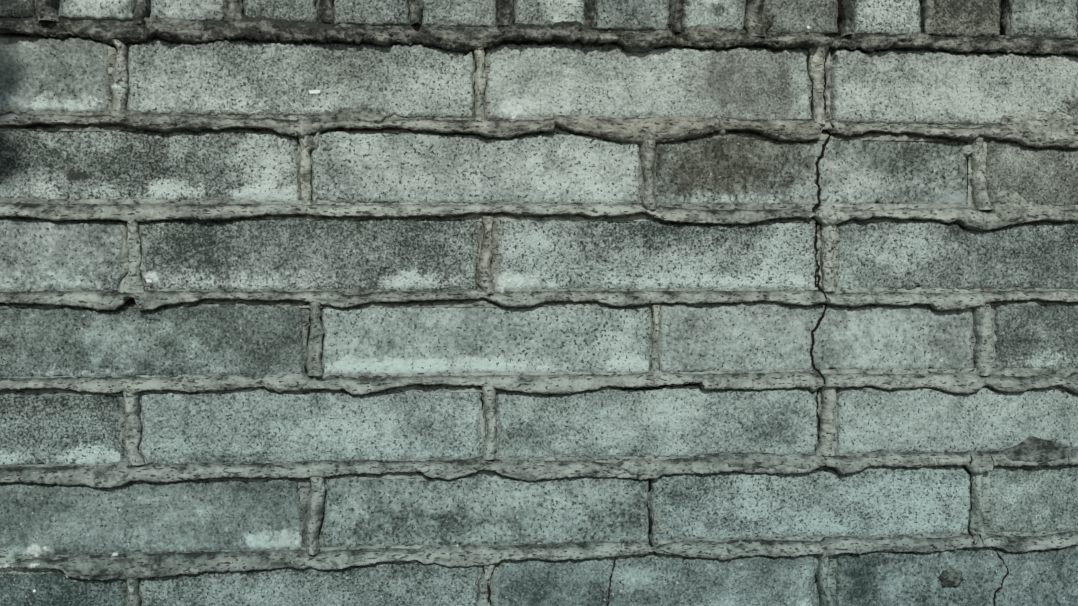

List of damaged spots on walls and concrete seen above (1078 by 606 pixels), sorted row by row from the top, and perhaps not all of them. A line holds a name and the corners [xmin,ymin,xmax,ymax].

crack [806,0,842,466]
crack [606,481,653,606]
crack [965,454,1009,606]